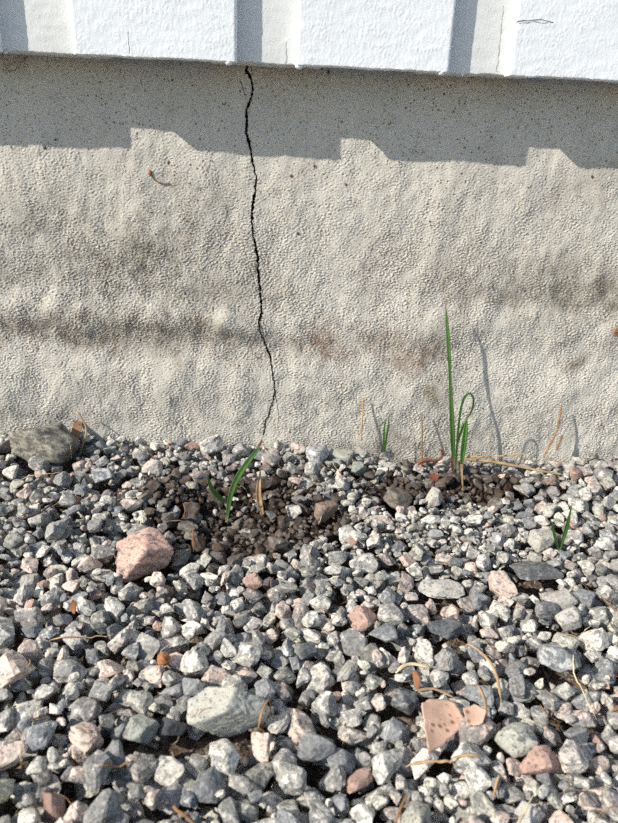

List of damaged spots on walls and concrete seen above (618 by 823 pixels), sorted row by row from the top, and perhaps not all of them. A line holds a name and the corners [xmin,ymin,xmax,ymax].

crack [240,66,279,435]